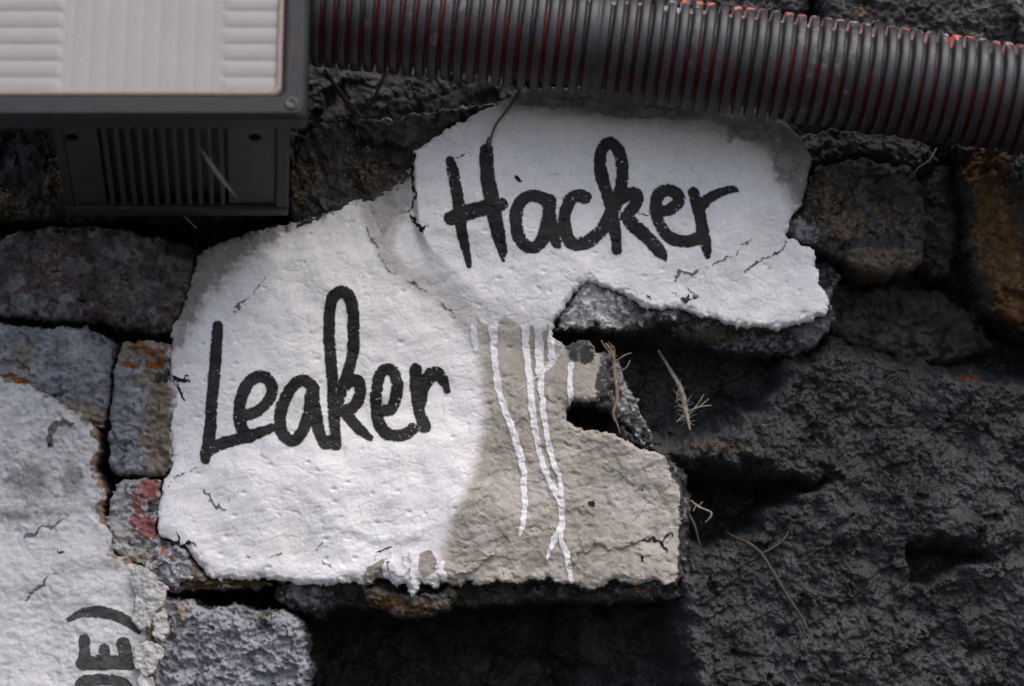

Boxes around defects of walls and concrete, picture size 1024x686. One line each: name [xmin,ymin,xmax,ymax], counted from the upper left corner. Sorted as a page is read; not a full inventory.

crack [671,239,787,298]
spalling [553,282,697,339]
spalling [362,548,465,598]
water stain [546,523,574,584]
peeling [130,564,171,686]